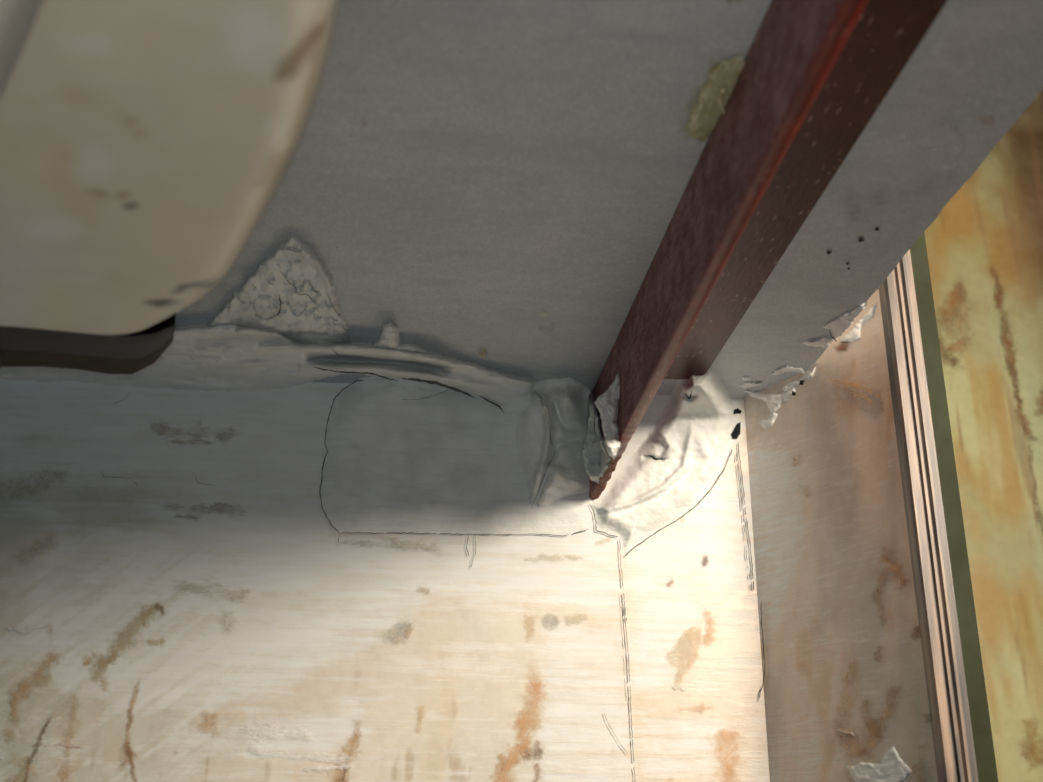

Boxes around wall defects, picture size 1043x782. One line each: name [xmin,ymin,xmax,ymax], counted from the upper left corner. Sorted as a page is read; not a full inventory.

crack [251,248,341,317]
peeling [801,301,877,349]
peeling [739,362,817,429]
crack [314,350,765,781]
corrosion [85,605,164,678]
corrosion [496,681,542,782]
peeling [845,746,912,782]